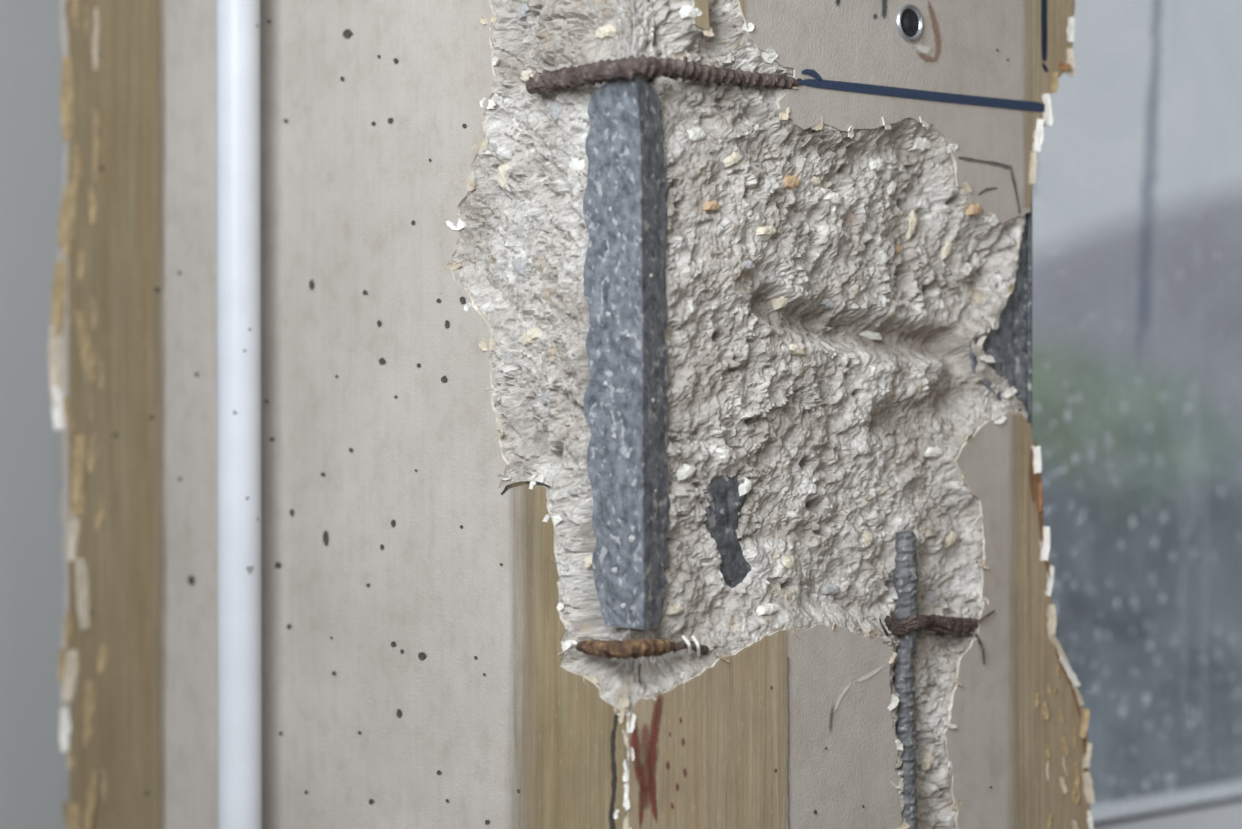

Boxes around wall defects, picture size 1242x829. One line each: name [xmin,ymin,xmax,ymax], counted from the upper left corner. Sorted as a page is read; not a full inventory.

spalling [444,0,1028,829]